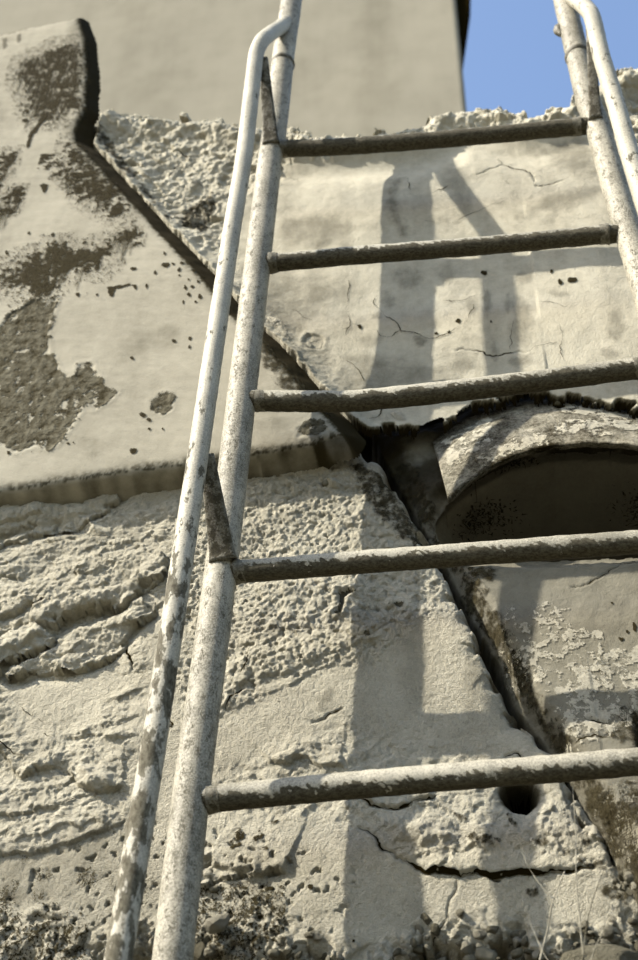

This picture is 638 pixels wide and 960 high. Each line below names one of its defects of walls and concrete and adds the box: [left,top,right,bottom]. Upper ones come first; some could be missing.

crack [429,160,556,223]
crack [373,296,583,359]
peeling [0,494,122,550]
peeling [0,550,169,684]
peeling [499,601,638,754]
crack [363,795,436,810]
crack [361,829,594,947]
spalling [254,941,285,960]